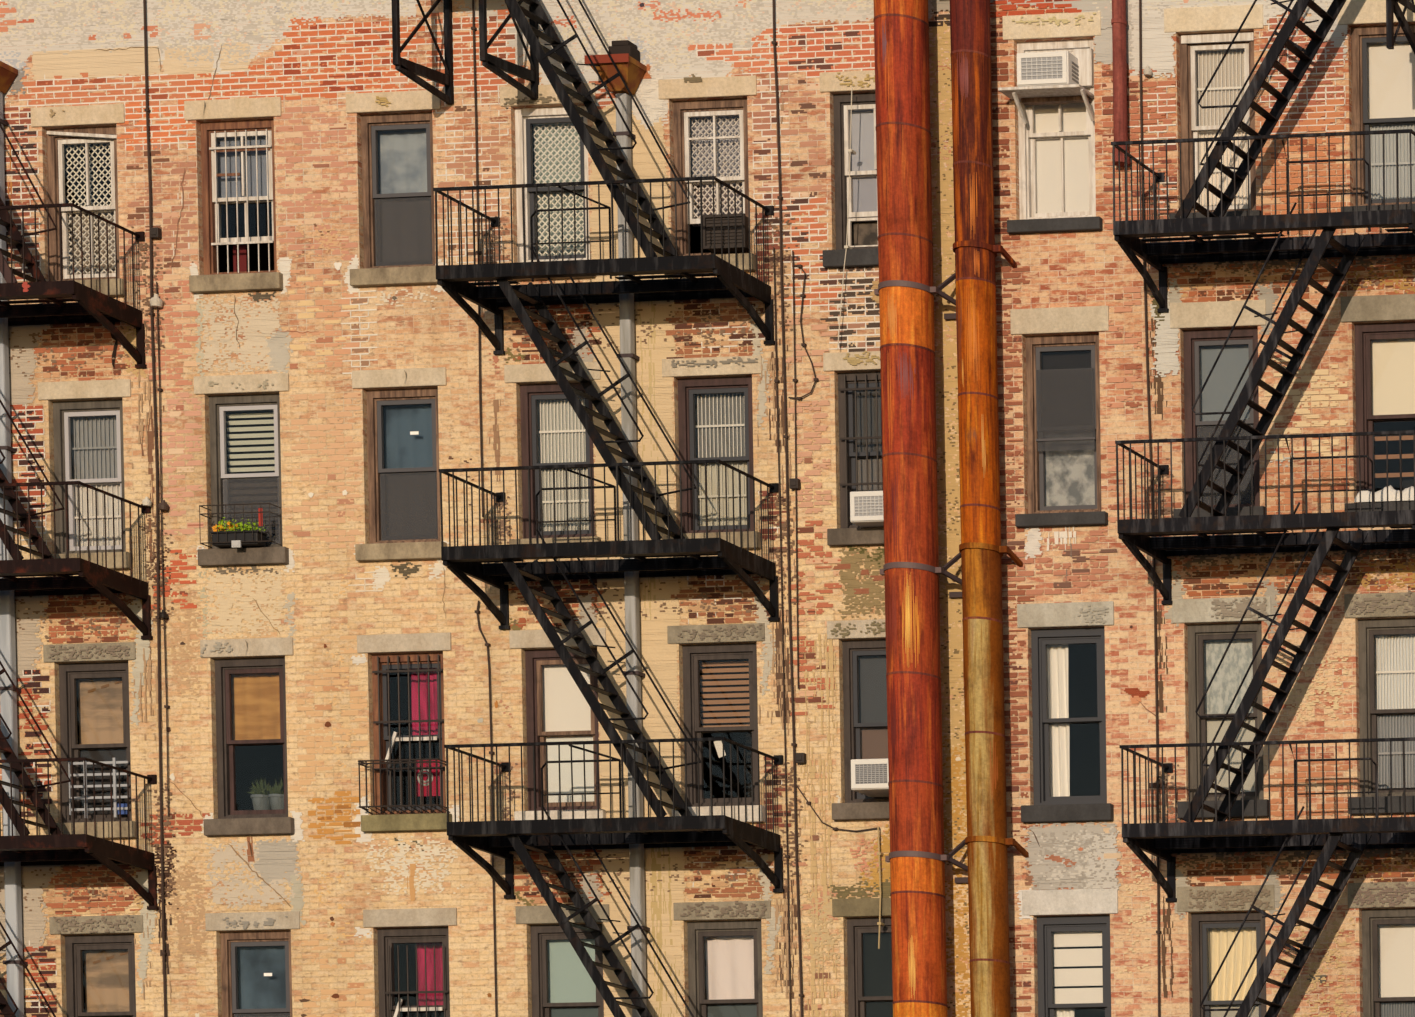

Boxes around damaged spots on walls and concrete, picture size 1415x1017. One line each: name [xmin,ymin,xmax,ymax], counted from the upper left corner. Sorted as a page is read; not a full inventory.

flaking render [990,0,1082,240]
flaking render [1101,63,1177,230]
flaking render [671,574,769,623]
flaking render [789,636,835,716]
flaking render [996,261,1186,887]